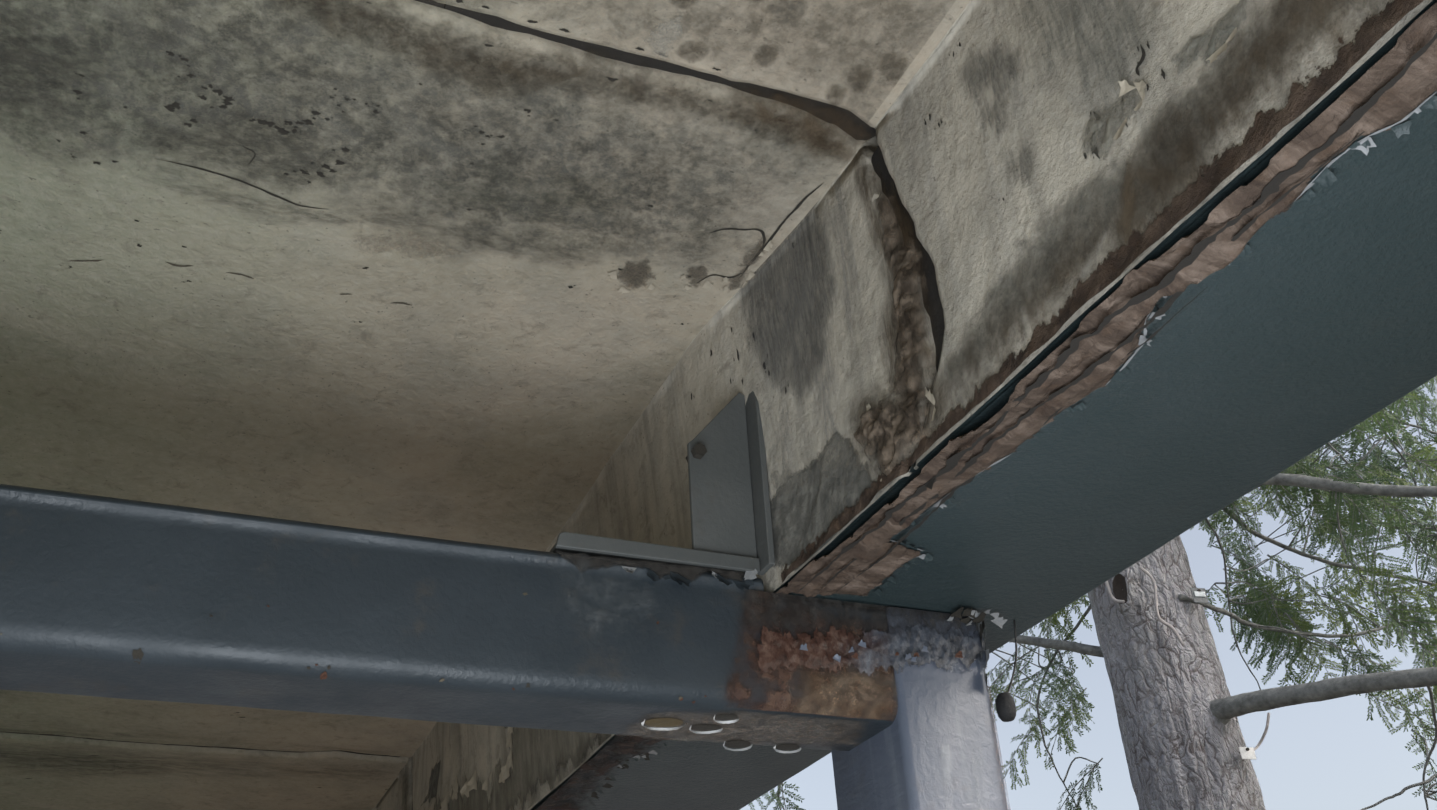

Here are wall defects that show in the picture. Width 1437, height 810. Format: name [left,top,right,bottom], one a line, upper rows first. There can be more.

leakage [0,0,734,256]
crack [415,0,945,372]
leakage [778,0,924,85]
leakage [950,0,1343,371]
peeling [1083,0,1244,159]
crack [912,472,935,490]
corrosion [636,0,1437,753]